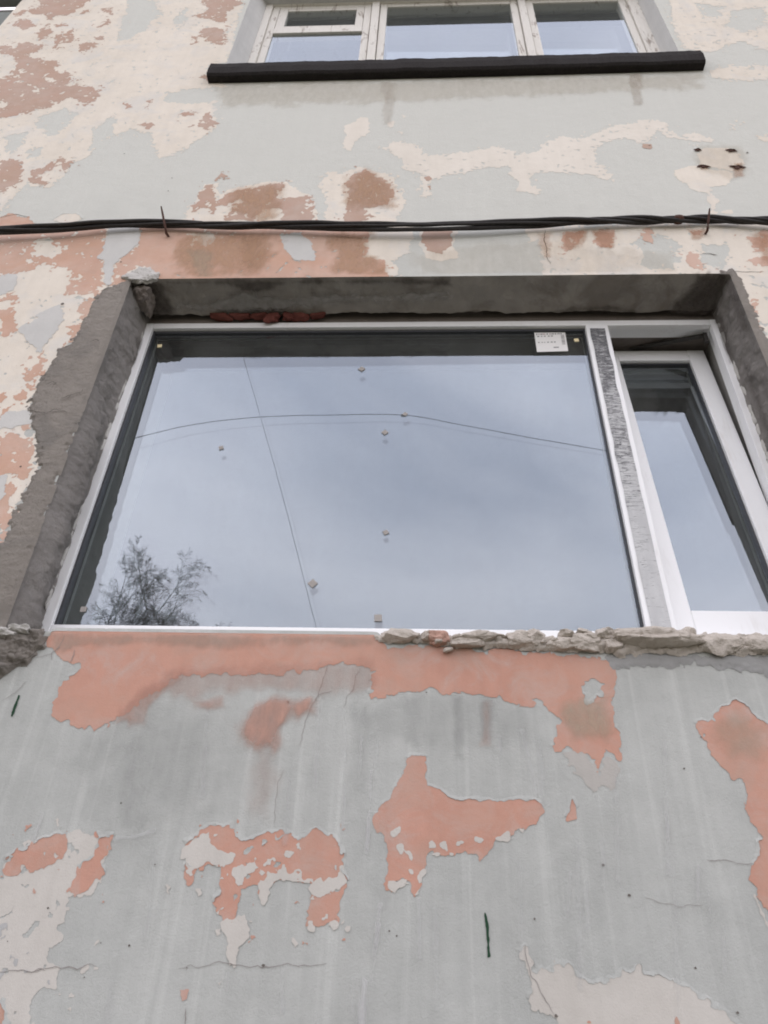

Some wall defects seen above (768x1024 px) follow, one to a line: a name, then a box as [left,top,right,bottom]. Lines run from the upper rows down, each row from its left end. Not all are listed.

peeling [0,0,768,543]
peeling [46,626,768,792]
peeling [0,818,115,1024]
peeling [154,818,350,968]
crack [179,961,326,970]
peeling [372,752,545,897]
peeling [516,942,742,1024]
peeling [693,697,768,927]